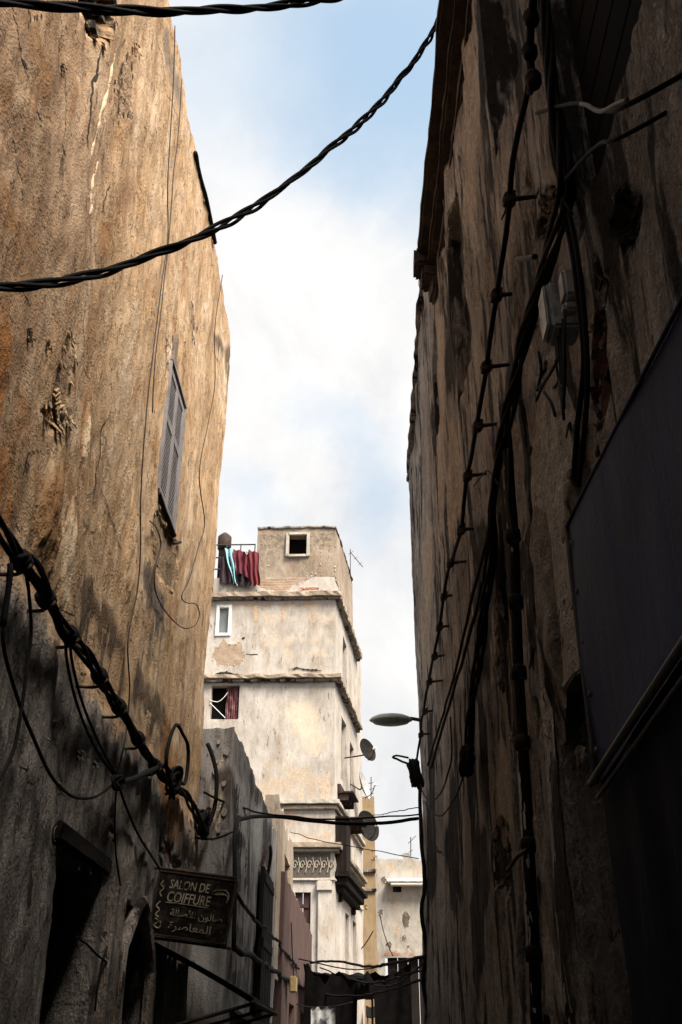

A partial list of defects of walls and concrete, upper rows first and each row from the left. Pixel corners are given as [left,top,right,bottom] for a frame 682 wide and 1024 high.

crack [87,48,102,149]
damp [458,0,522,452]
peeling [24,323,79,436]
flaking render [209,637,250,670]